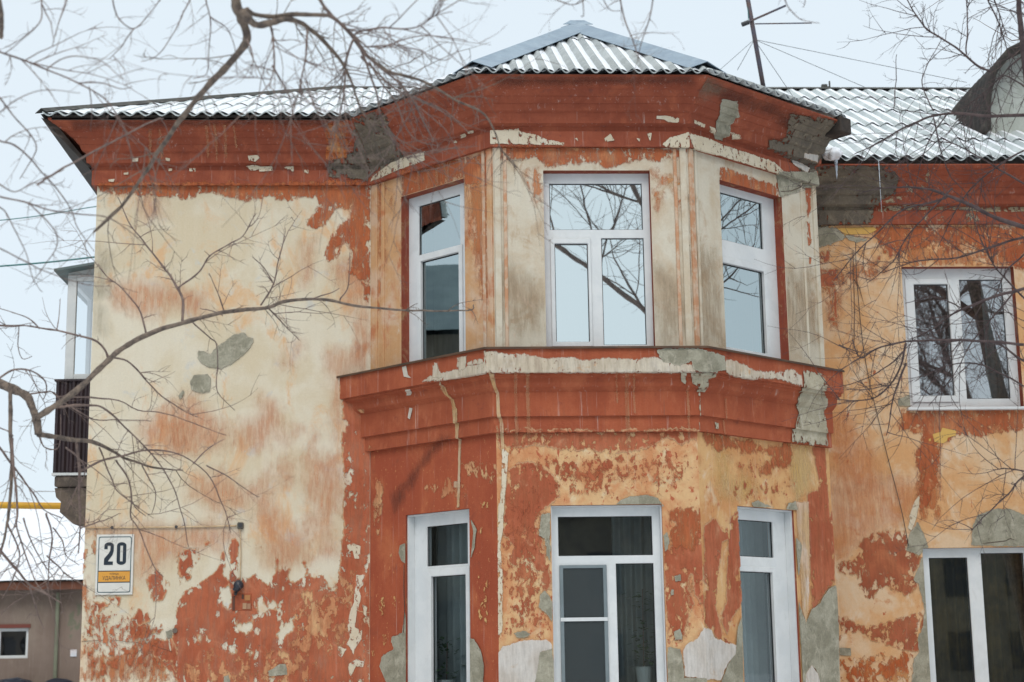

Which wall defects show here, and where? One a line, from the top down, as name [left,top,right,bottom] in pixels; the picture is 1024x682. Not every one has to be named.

peeling [97,99,1024,322]
flaking render [179,333,253,399]
peeling [80,385,406,682]
peeling [422,348,1024,682]